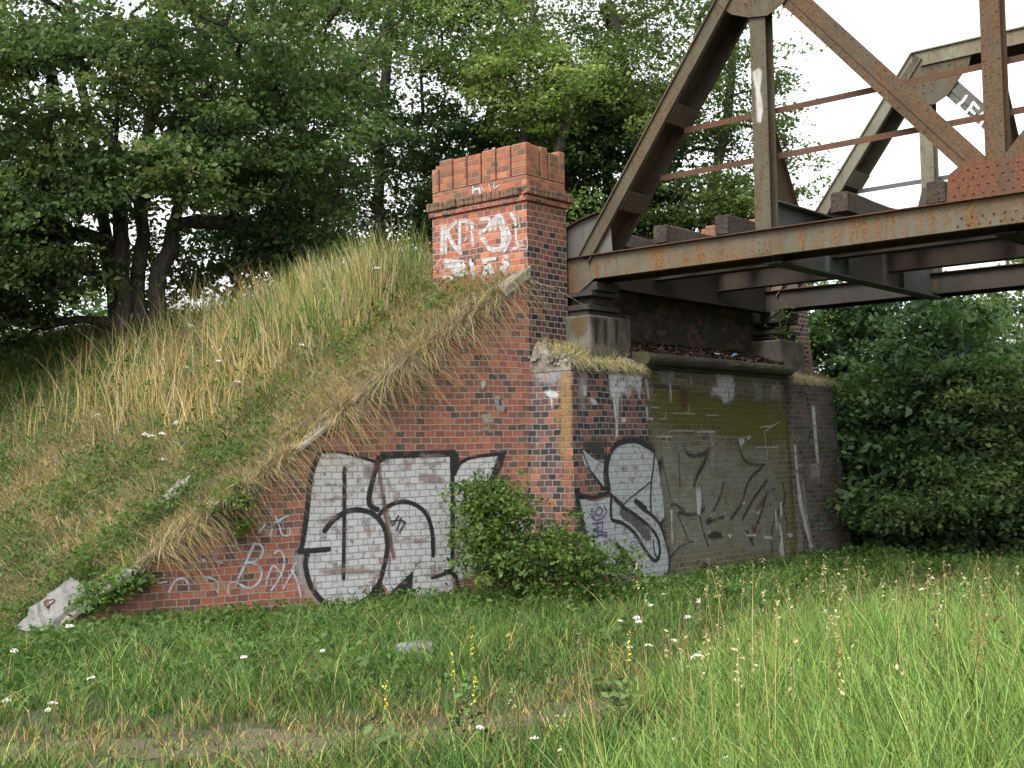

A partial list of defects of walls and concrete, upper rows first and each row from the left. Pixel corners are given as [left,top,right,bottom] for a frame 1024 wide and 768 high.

spalling [527,341,645,375]
damp [609,363,649,437]
damp [711,374,735,403]